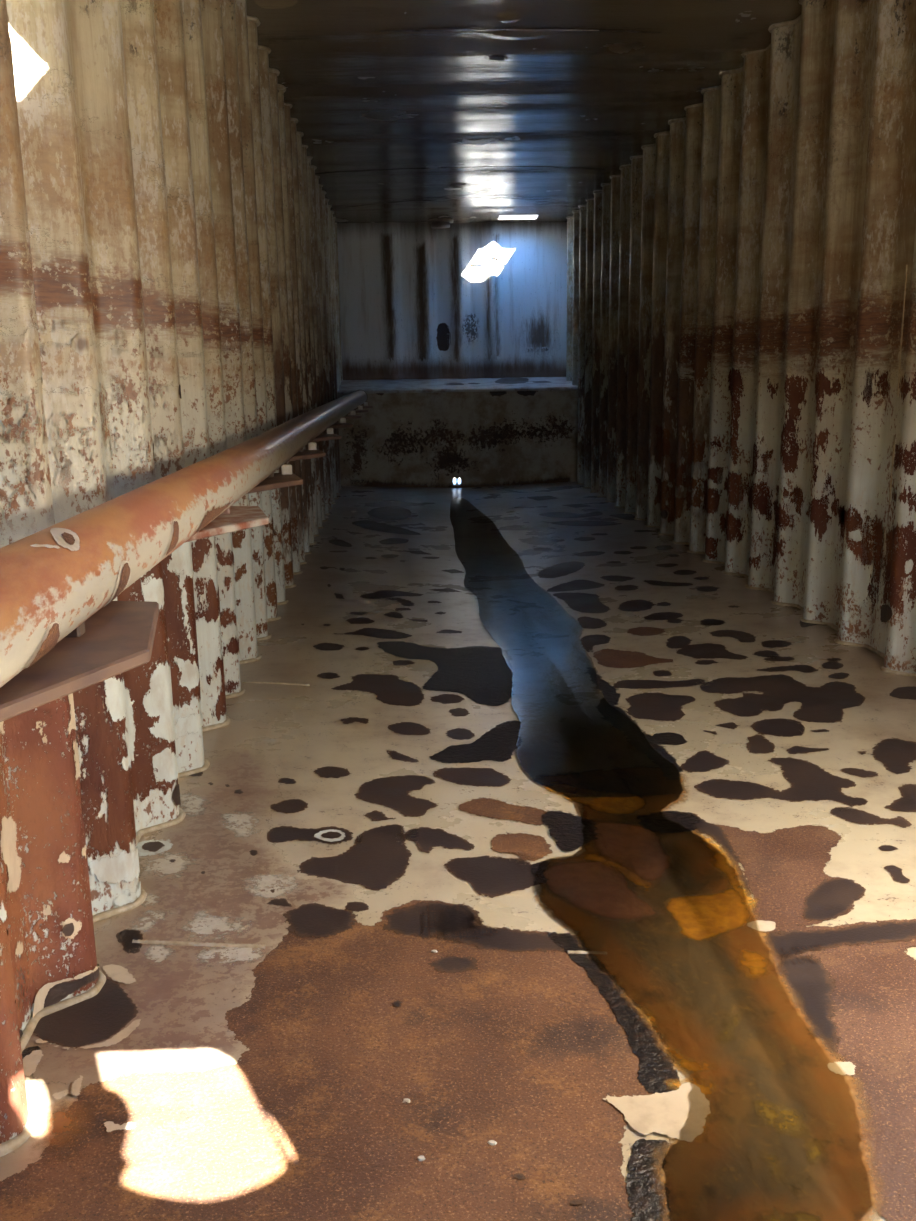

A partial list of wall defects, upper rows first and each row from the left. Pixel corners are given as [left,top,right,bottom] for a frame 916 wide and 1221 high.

corrosion [0,0,916,600]
peeling [0,501,299,1144]
corrosion [0,747,680,1221]
peeling [222,588,553,912]
peeling [352,506,464,573]
corrosion [832,582,916,673]